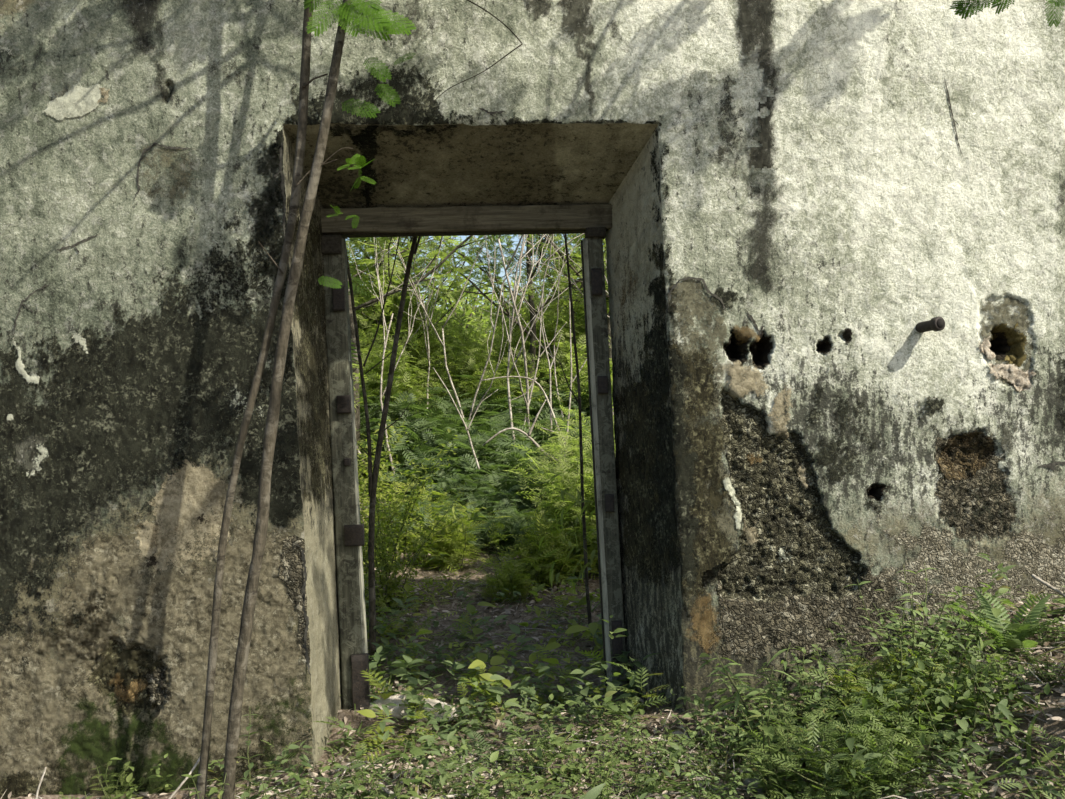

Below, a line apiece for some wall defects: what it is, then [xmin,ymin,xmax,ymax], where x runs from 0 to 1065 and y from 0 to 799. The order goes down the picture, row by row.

peeling [43,82,110,120]
water stain [116,0,177,103]
water stain [710,0,781,292]
water stain [28,332,121,424]
water stain [711,287,753,317]
spalling [979,295,1036,392]
water stain [207,371,303,533]
spalling [707,325,1065,663]
water stain [0,530,52,635]